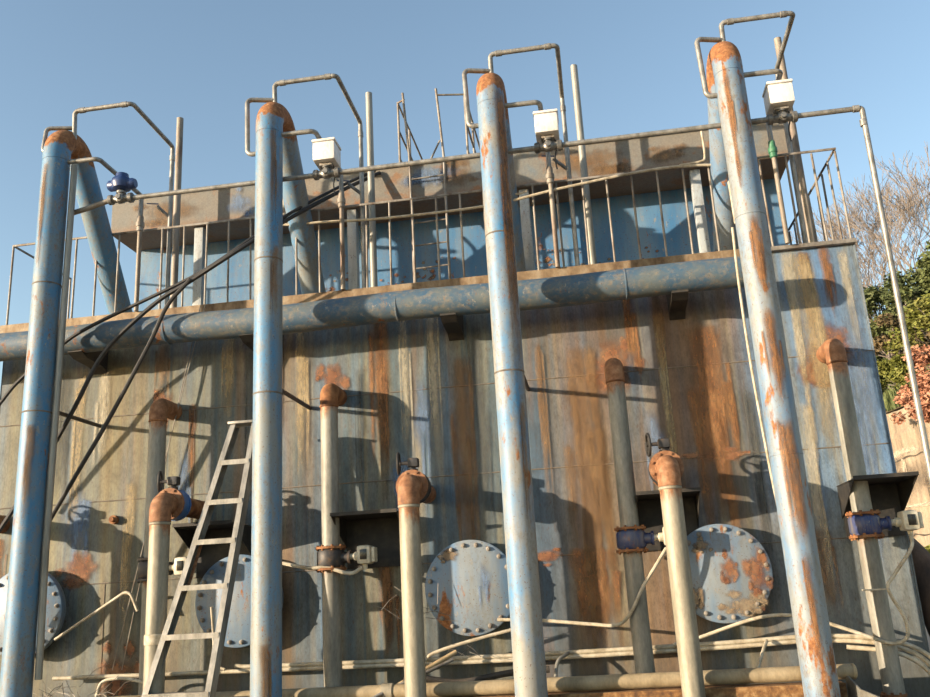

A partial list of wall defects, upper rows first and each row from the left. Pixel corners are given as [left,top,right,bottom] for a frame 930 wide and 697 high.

corrosion [749,219,766,285]
corrosion [819,248,837,302]
corrosion [368,323,389,458]
corrosion [535,348,552,472]
corrosion [565,299,644,621]
corrosion [682,328,751,519]
corrosion [761,310,785,387]
corrosion [776,421,840,593]
corrosion [54,555,96,588]
corrosion [379,567,400,652]
corrosion [538,548,561,567]
corrosion [802,560,820,653]